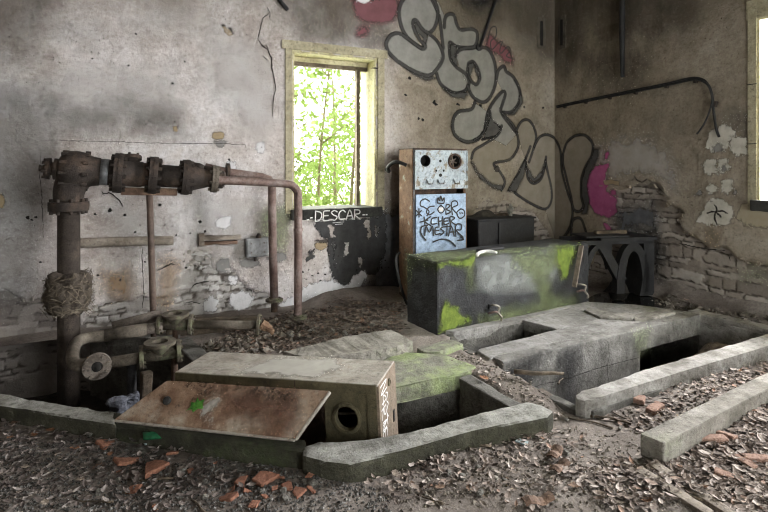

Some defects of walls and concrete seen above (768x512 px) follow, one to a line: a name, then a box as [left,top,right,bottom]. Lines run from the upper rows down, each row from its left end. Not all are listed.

crack [257,7,277,117]
flaking render [80,248,280,328]
peeling [302,214,388,286]
water stain [483,253,554,289]
flaking render [599,171,768,303]
flaking render [0,290,57,398]